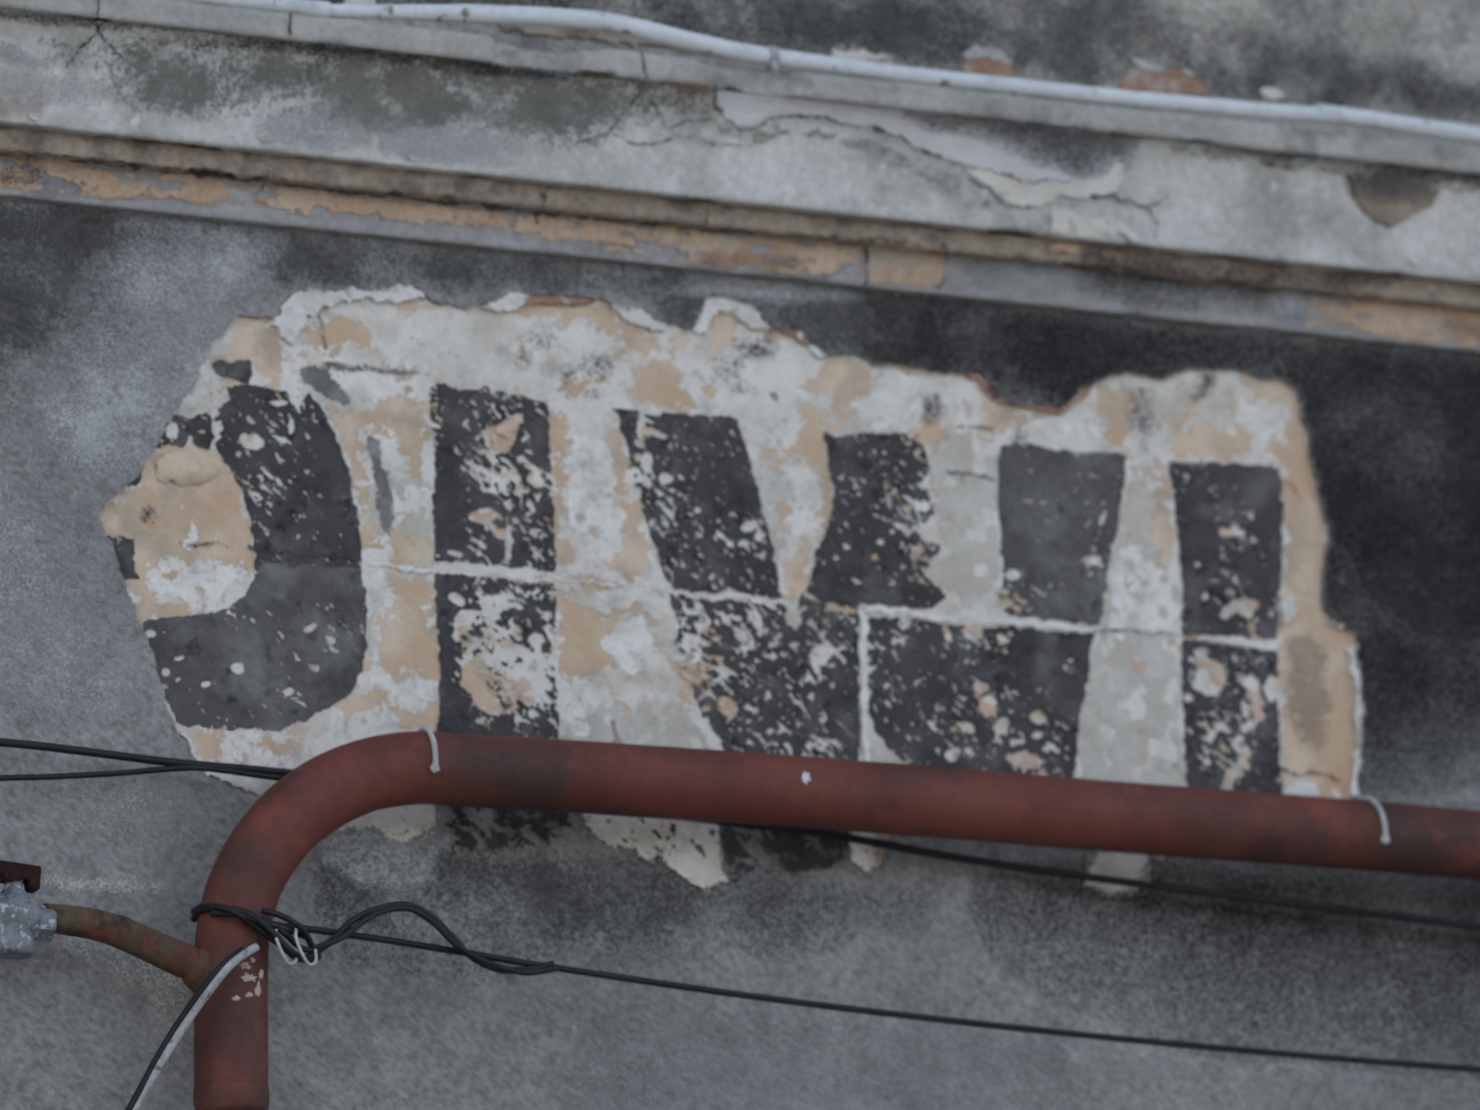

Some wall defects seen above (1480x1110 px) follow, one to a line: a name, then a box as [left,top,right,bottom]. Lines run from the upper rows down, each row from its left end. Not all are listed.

leakage [376,0,1480,125]
spalling [961,44,1015,78]
spalling [1119,57,1209,96]
peeling [0,149,945,289]
peeling [671,80,1138,255]
spalling [1347,173,1438,228]
peeling [1304,295,1480,350]
peeling [99,284,1367,800]